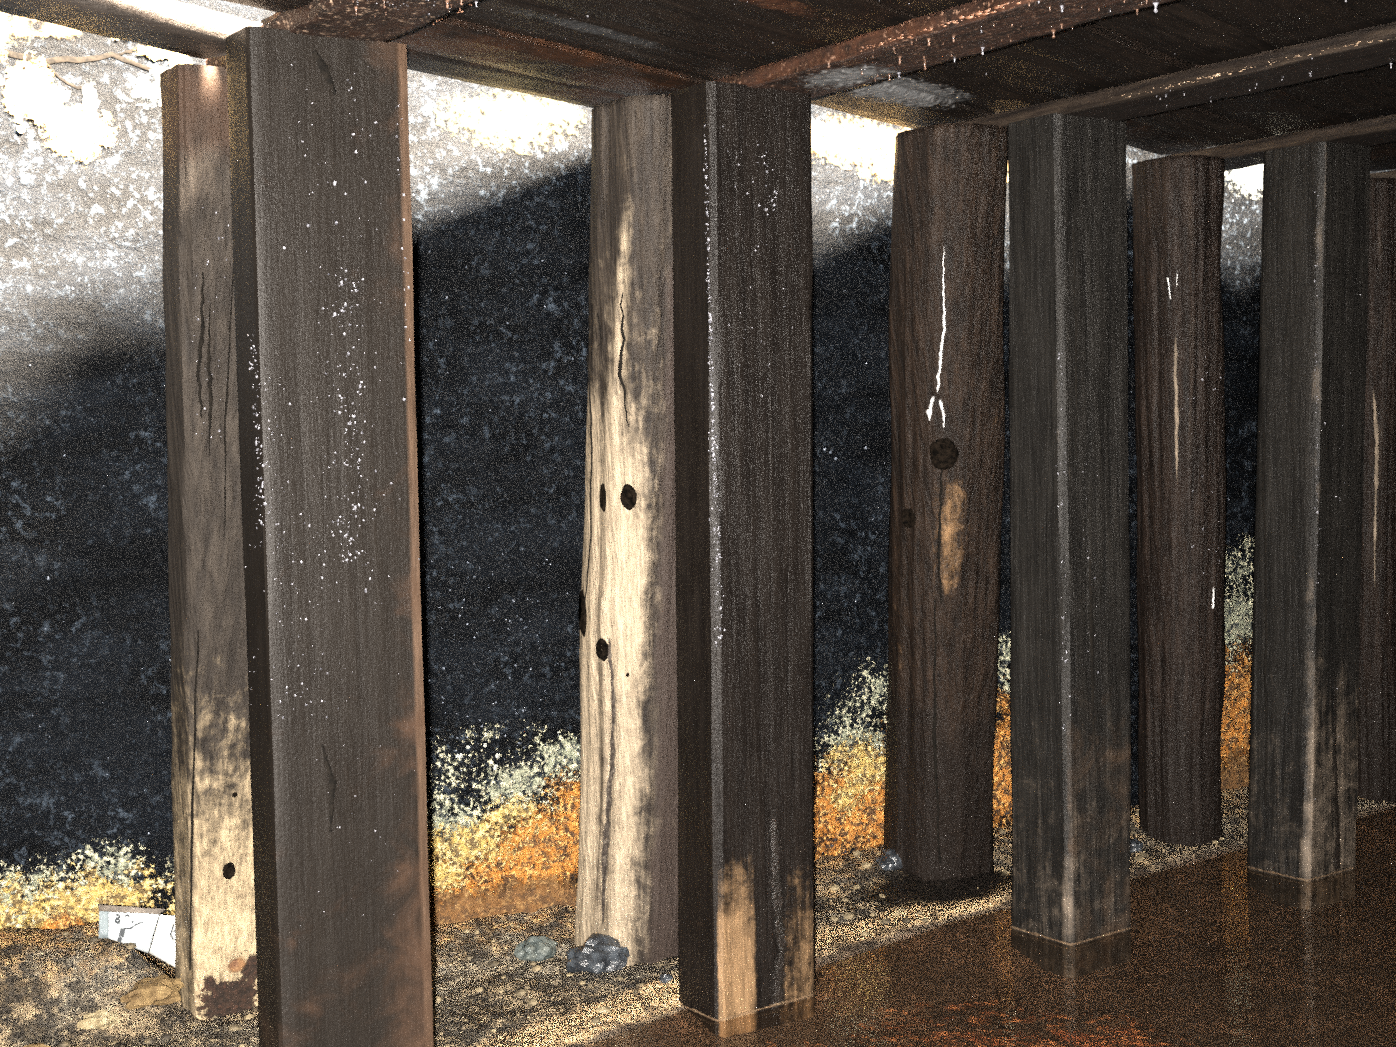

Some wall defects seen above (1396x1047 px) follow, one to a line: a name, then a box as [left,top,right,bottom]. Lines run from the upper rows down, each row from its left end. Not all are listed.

crack [196,272,233,537]
crack [584,293,630,603]
leakage [926,252,946,427]